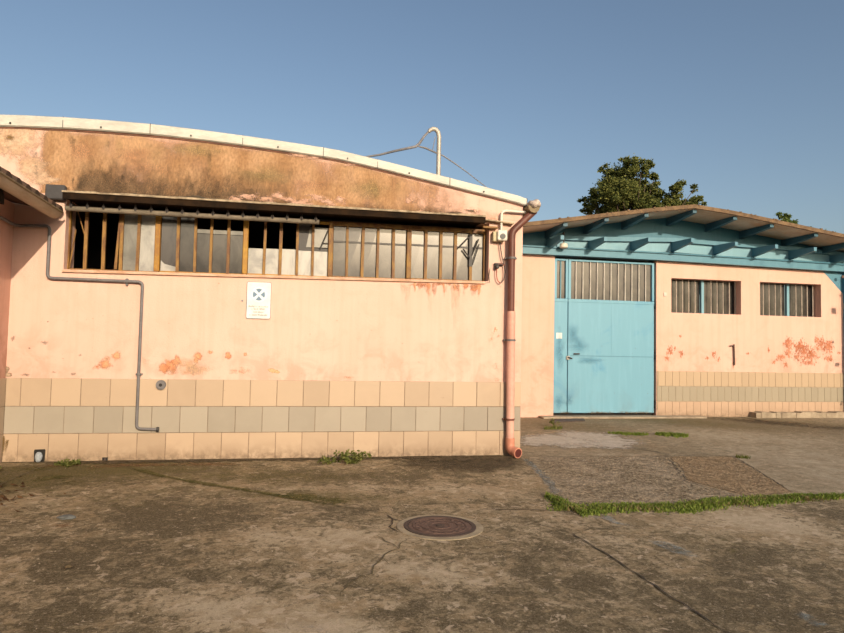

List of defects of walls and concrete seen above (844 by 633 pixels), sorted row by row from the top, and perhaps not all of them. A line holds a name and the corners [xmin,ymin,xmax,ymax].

damp [40,130,474,214]
peeling [230,193,346,206]
corrosion [412,282,481,294]
peeling [159,351,212,373]
peeling [768,336,841,367]